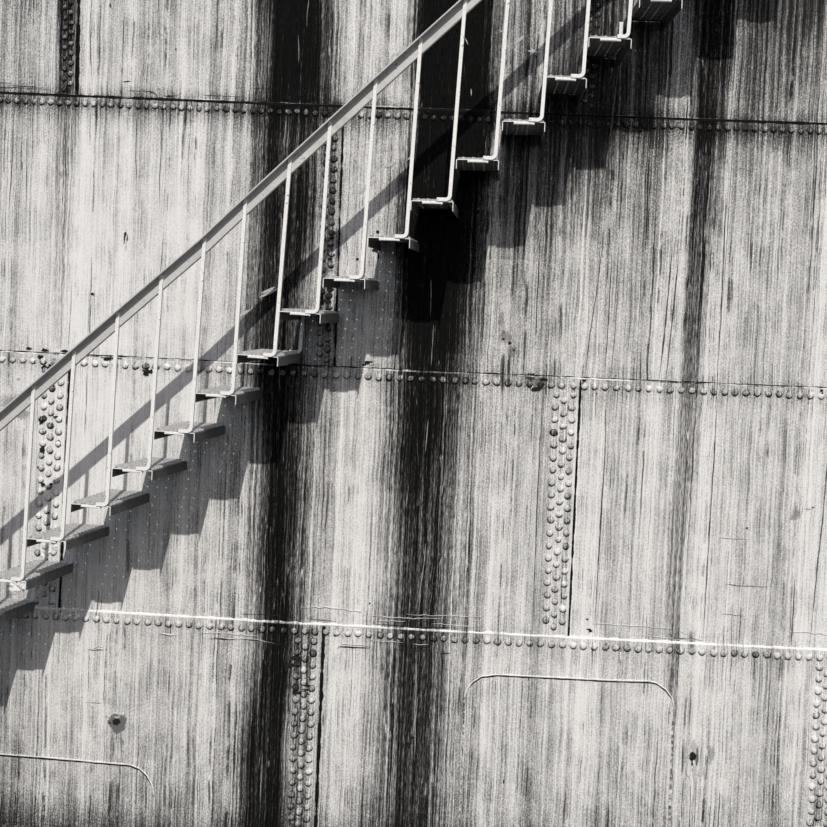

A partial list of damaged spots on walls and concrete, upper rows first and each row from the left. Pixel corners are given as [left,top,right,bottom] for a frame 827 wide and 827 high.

leakage [228,141,333,827]
leakage [251,0,339,187]
leakage [368,0,502,827]
leakage [500,0,673,255]